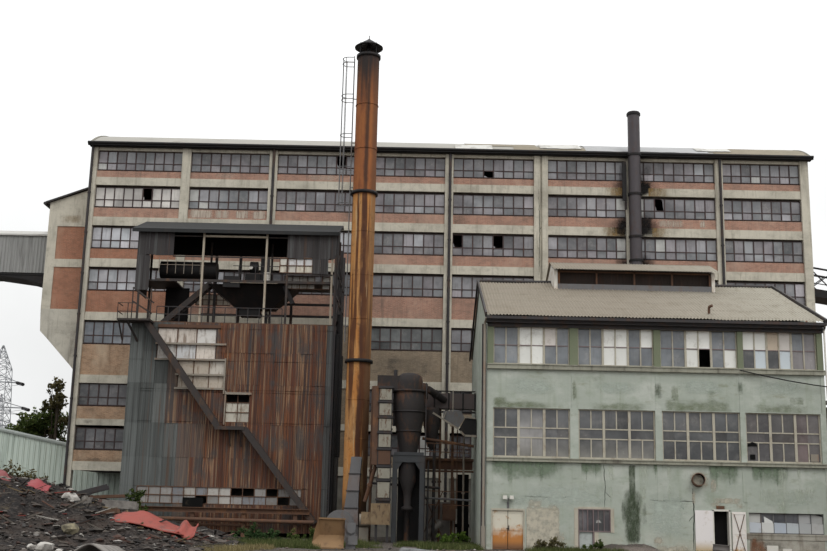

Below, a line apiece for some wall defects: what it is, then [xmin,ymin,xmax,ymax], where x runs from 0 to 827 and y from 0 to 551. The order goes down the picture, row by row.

damp [625,465,657,542]